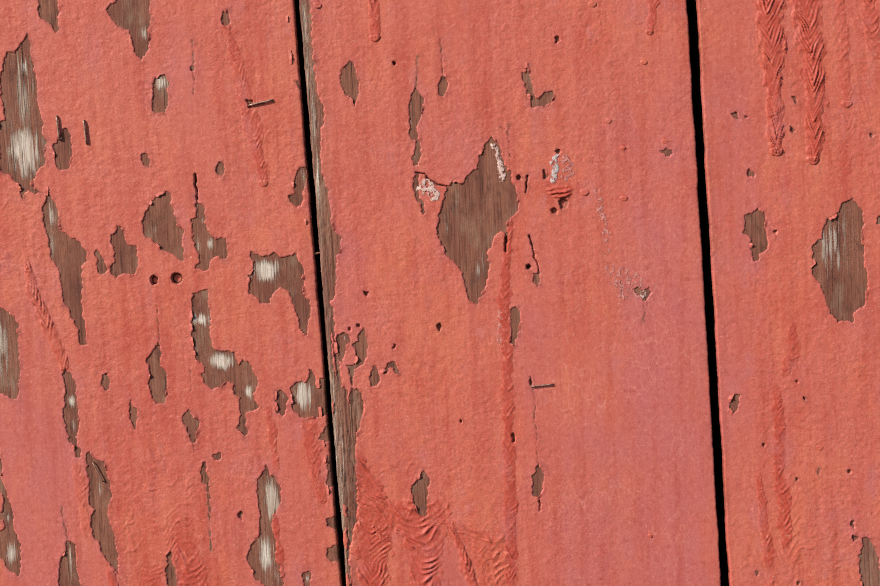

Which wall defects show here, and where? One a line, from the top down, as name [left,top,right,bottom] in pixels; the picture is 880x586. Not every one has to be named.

peeling [107,0,153,59]
peeling [0,307,21,399]
peeling [0,35,138,345]
peeling [143,191,228,271]
peeling [189,289,259,436]
peeling [247,252,311,336]
peeling [275,0,403,586]
peeling [409,88,425,214]
peeling [437,135,520,304]
peeling [809,199,869,324]
peeling [59,541,81,586]
peeling [247,466,284,586]